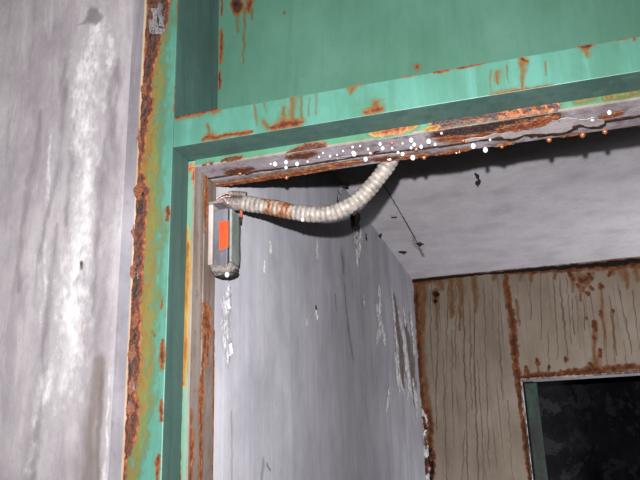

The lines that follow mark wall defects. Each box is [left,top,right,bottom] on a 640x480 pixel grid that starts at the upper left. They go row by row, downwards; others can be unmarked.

rust [123,0,178,480]
rust [188,103,562,234]
crack [384,186,423,256]
peeling [465,117,604,142]
rust [573,91,639,104]
rust [598,110,624,120]
rust [182,225,191,398]
rust [180,299,215,480]
peeling [222,282,233,365]
peeling [376,284,386,347]
peeling [386,286,434,480]
rust [412,258,640,480]